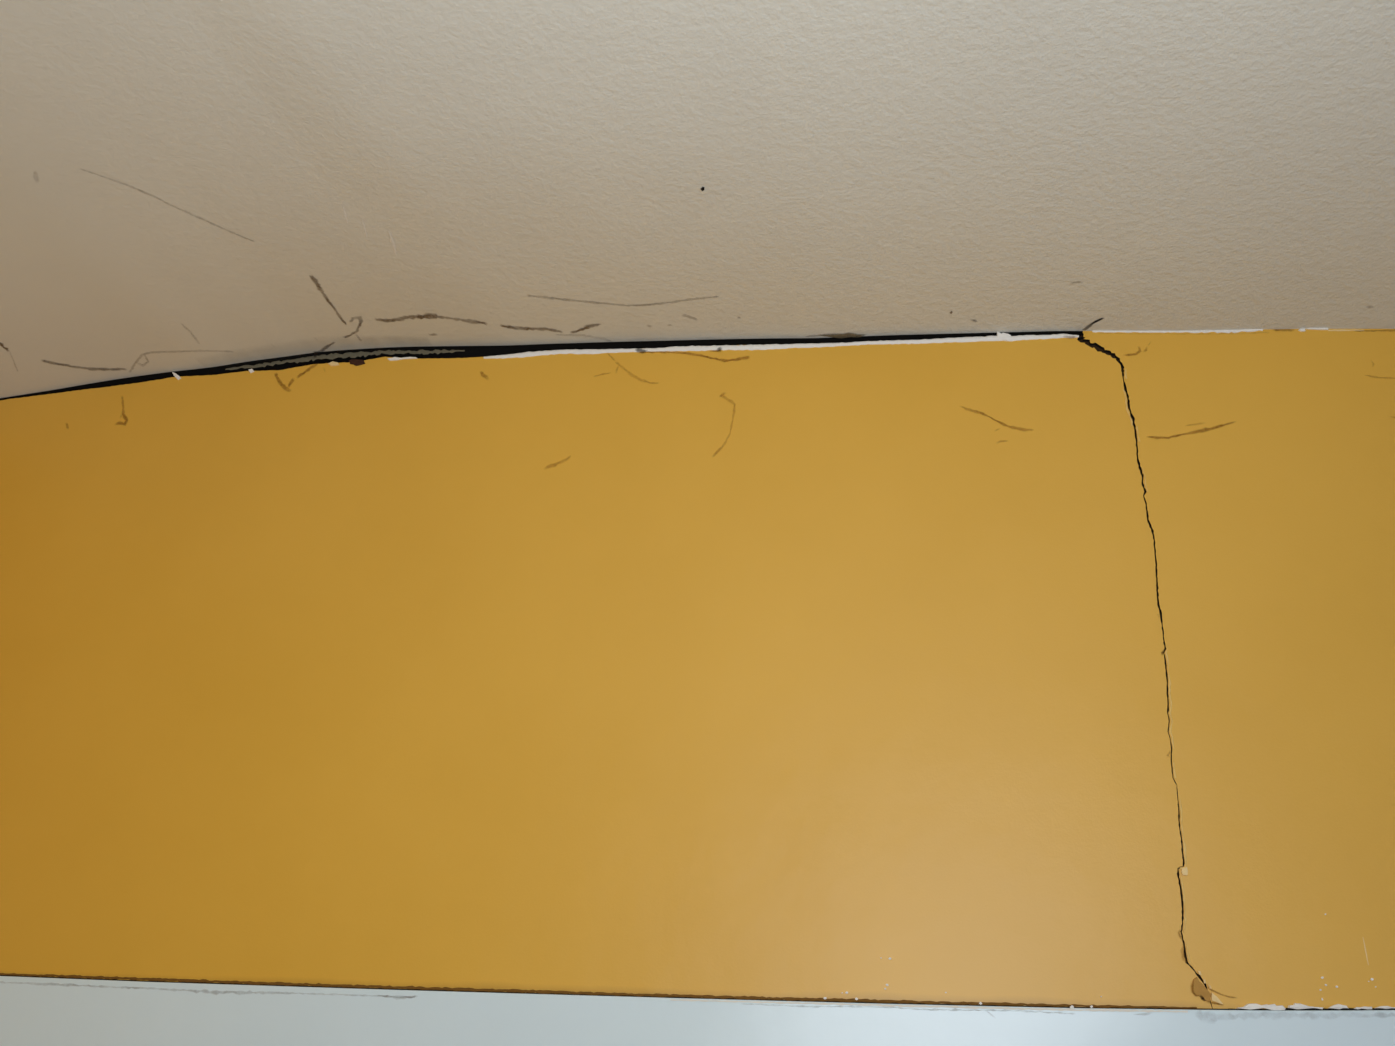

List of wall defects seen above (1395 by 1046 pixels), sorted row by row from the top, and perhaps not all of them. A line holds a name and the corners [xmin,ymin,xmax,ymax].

crack [275,277,442,388]
crack [476,321,598,333]
crack [641,350,745,362]
crack [670,318,1227,1013]